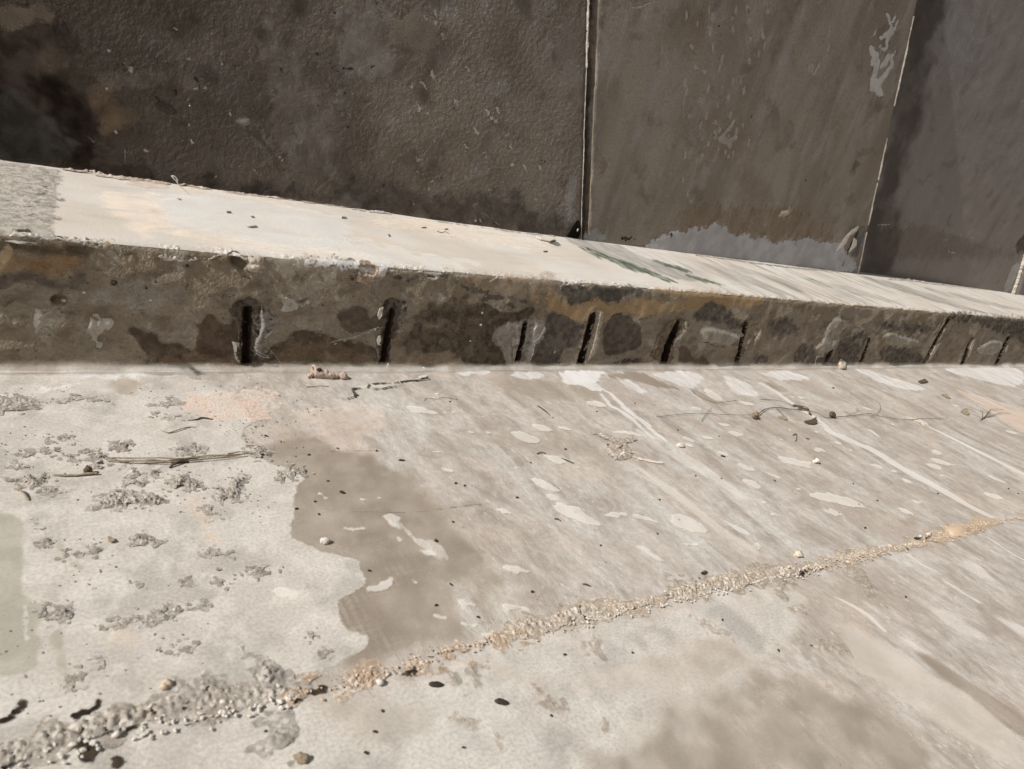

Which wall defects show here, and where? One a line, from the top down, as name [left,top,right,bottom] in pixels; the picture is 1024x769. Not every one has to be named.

peeling [869,13,915,106]
spalling [1,229,1024,371]
water stain [269,436,498,663]
crack [294,685,326,703]
crack [403,666,417,676]
crack [0,699,26,769]
crack [70,699,156,768]